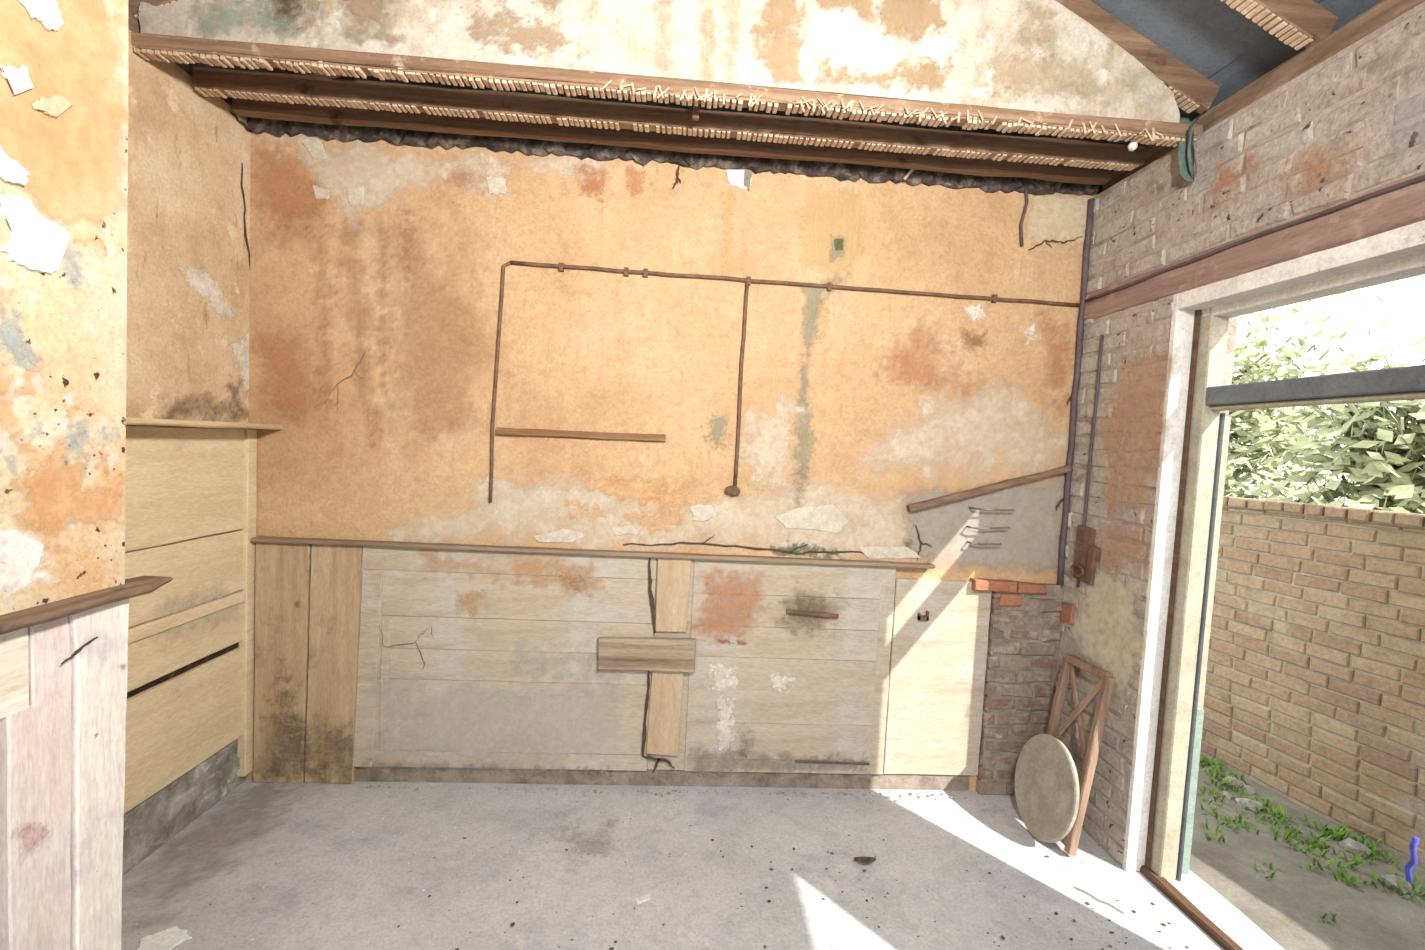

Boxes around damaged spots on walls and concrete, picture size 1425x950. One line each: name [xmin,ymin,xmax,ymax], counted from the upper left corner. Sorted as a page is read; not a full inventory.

flaking render [804,7,960,76]
flaking render [0,0,127,275]
flaking render [389,468,921,561]
crack [641,671,675,772]
water stain [171,691,353,864]